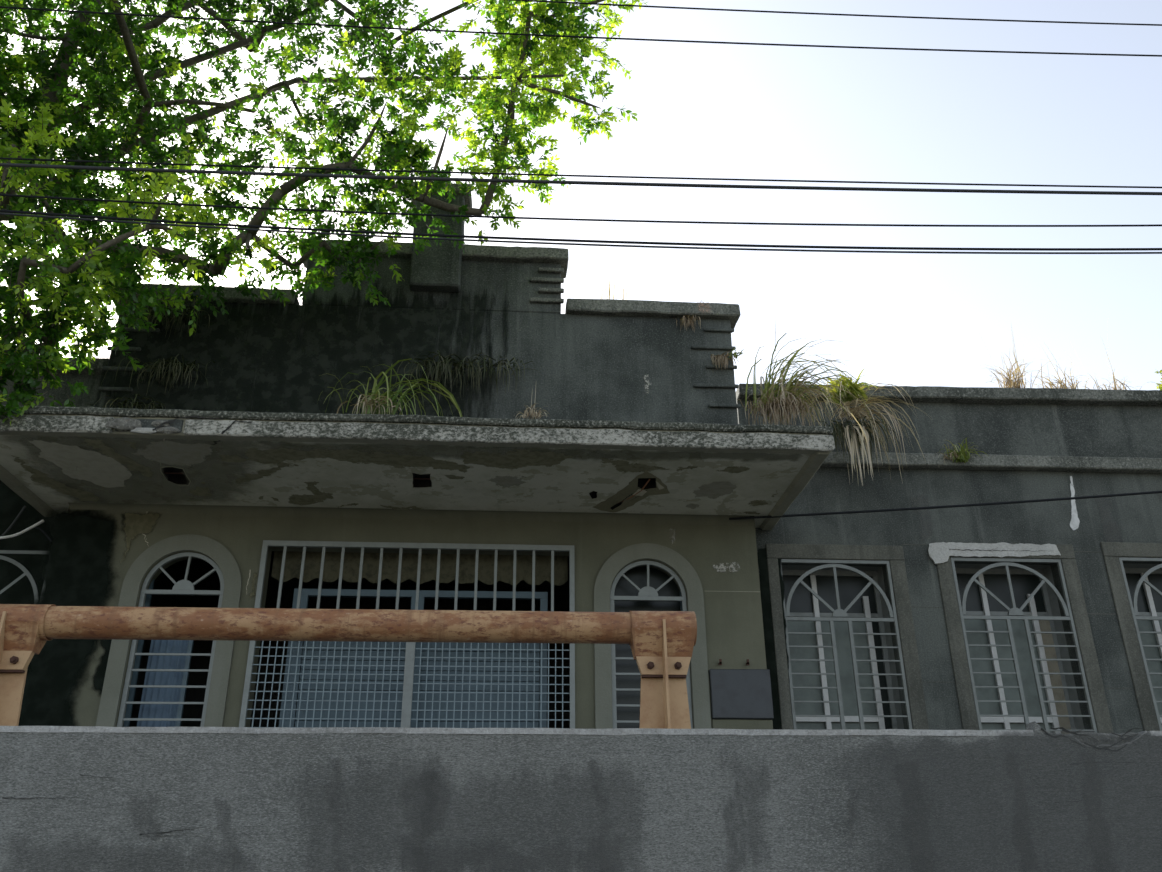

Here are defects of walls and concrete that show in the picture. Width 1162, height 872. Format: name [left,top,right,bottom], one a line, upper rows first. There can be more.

peeling [7,415,574,505]
spalling [589,458,698,513]
peeling [686,466,750,509]
water stain [1070,476,1080,530]
water stain [18,639,112,726]